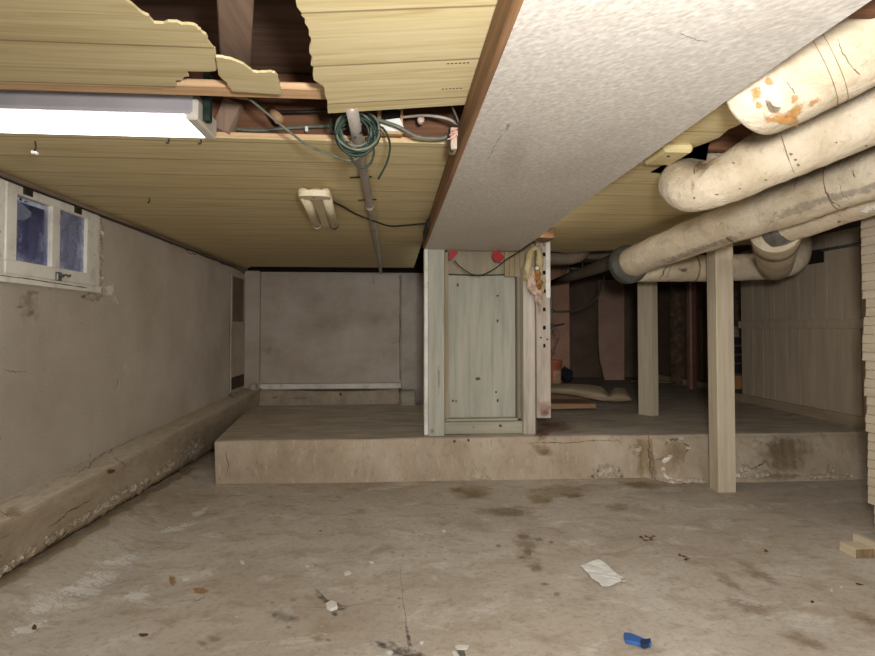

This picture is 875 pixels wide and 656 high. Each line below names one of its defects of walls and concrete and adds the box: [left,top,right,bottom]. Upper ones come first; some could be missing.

corrosion [752,78,772,108]
corrosion [766,96,818,125]
crack [74,441,128,475]
peeling [661,436,705,484]
spalling [0,434,206,578]